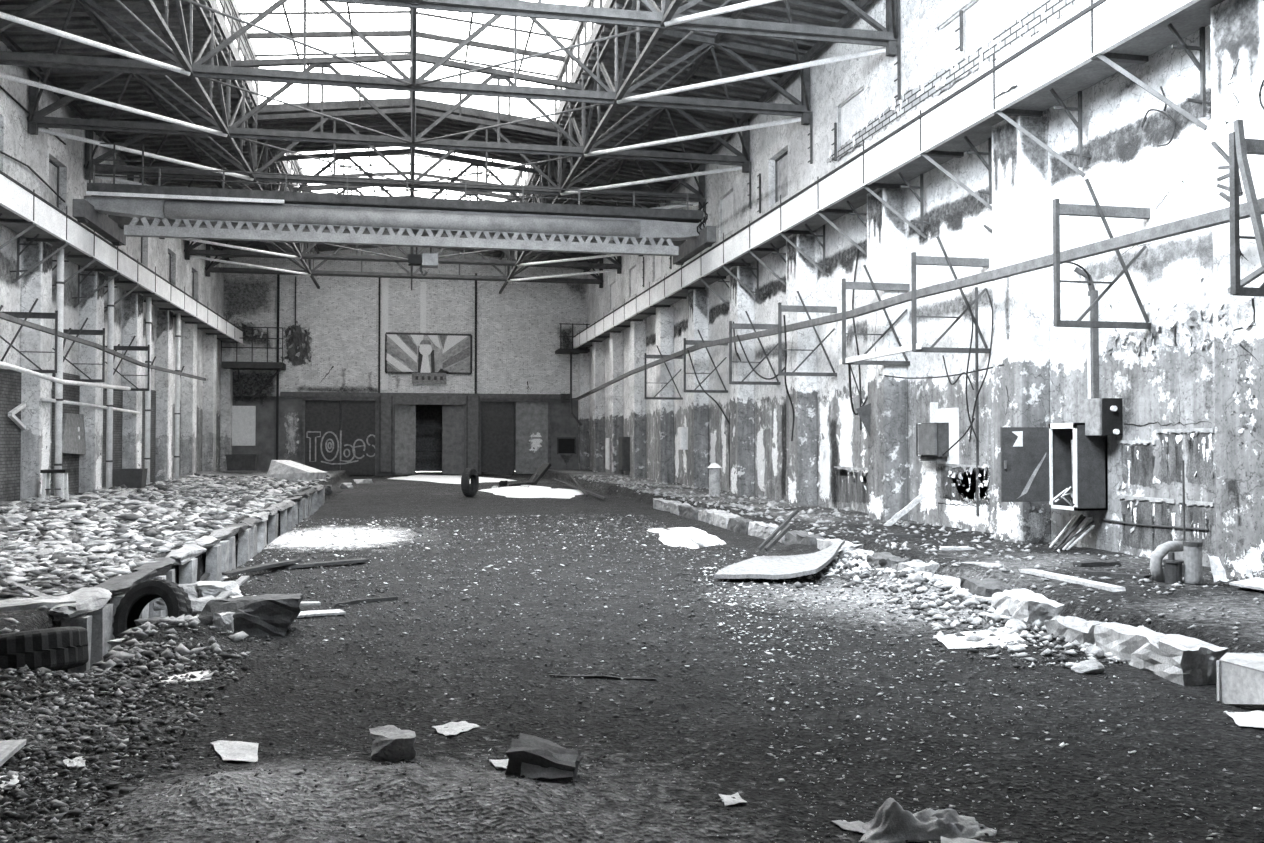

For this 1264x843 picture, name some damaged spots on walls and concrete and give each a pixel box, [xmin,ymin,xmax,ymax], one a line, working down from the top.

flaking render [827,0,1083,163]
damp [674,0,1260,339]
peeling [674,416,687,478]
peeling [709,414,738,494]
peeling [755,403,797,503]
flaking render [817,393,884,519]
flaking render [1117,428,1264,580]
spalling [1231,378,1263,446]